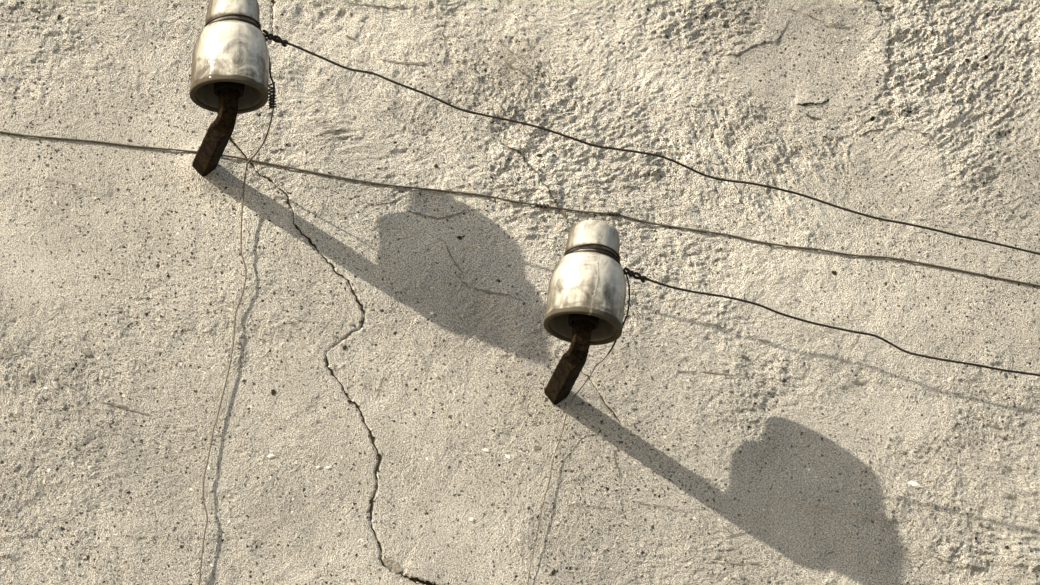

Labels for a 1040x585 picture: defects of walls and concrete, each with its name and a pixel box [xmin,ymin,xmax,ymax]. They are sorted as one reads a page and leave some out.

crack [501,142,572,226]
crack [364,198,526,303]
crack [229,137,436,585]